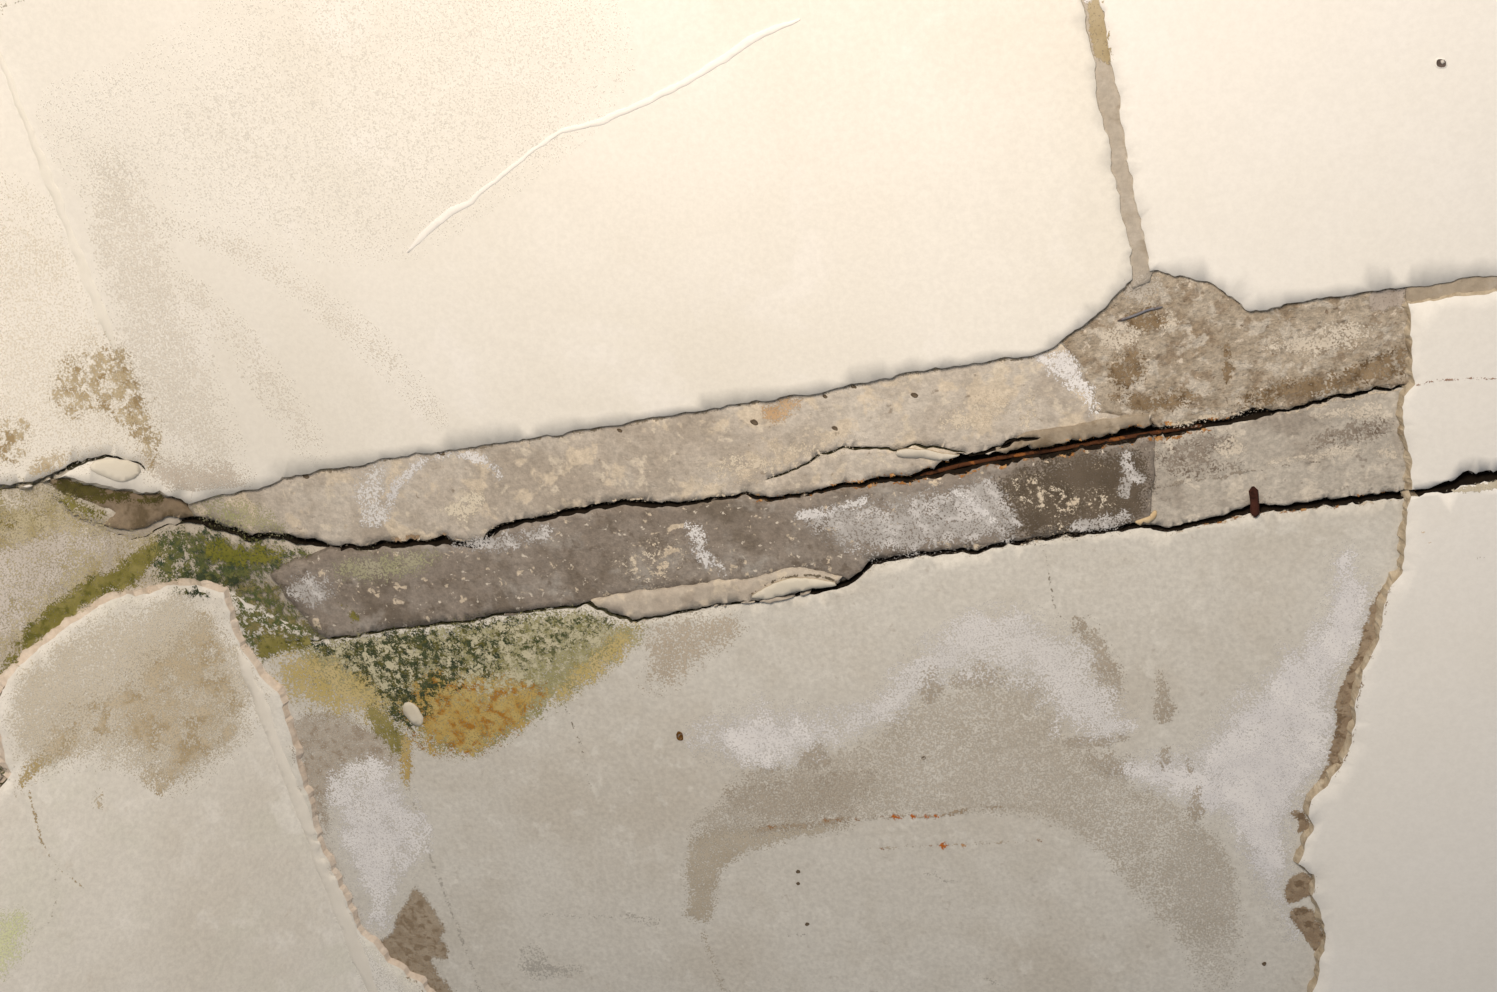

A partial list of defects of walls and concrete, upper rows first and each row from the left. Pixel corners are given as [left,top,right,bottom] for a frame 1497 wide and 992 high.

spalling [0,477,200,673]
peeling [90,458,141,482]
damp [284,488,556,609]
damp [350,450,502,528]
damp [684,520,726,578]
crack [0,377,1497,551]
crack [281,470,1497,643]
damp [794,430,1245,562]
damp [2,592,268,797]
damp [682,543,1381,990]
spalling [1272,764,1327,898]
spalling [381,889,452,992]